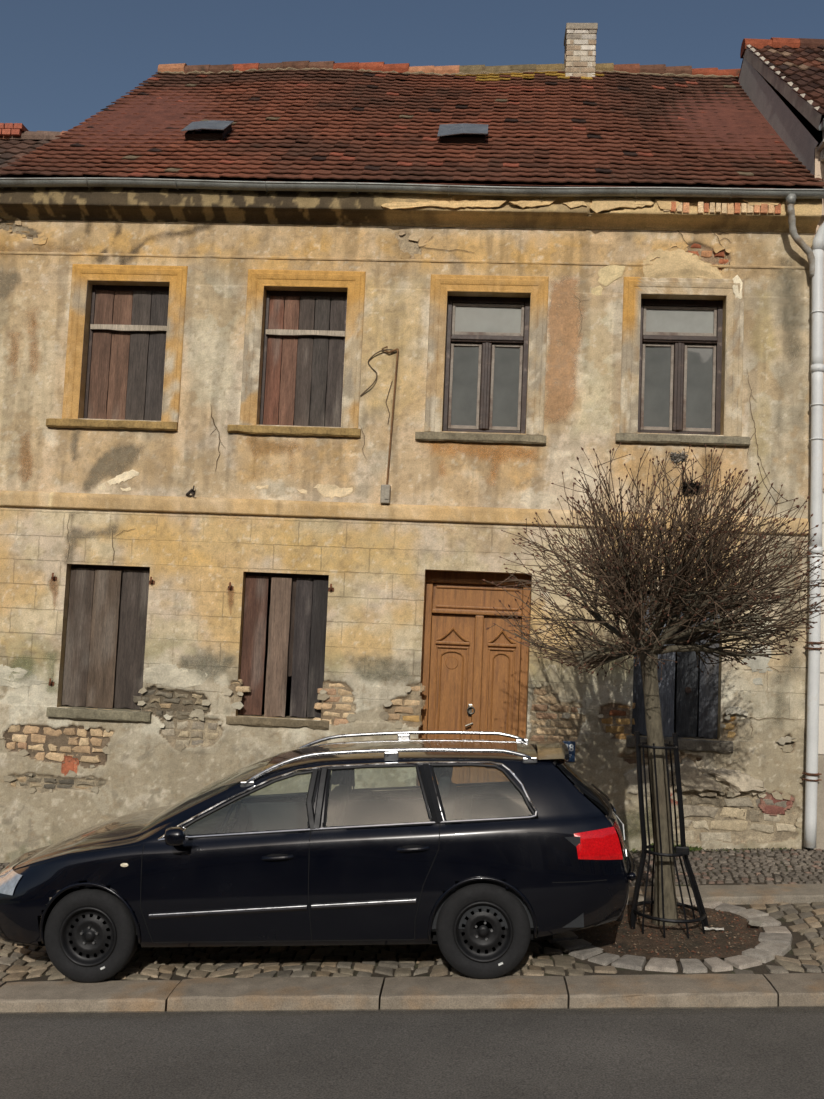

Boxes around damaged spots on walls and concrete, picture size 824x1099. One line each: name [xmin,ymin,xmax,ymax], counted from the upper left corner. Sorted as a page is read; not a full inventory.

flaking render [381,197,781,215]
crack [209,404,226,472]
crack [746,369,770,485]
flaking render [133,664,251,751]
flaking render [313,680,358,726]
flaking render [379,683,425,729]
flaking render [525,683,636,763]
flaking render [718,706,748,741]
flaking render [2,725,114,794]
flaking render [612,752,650,797]
flaking render [665,752,803,845]